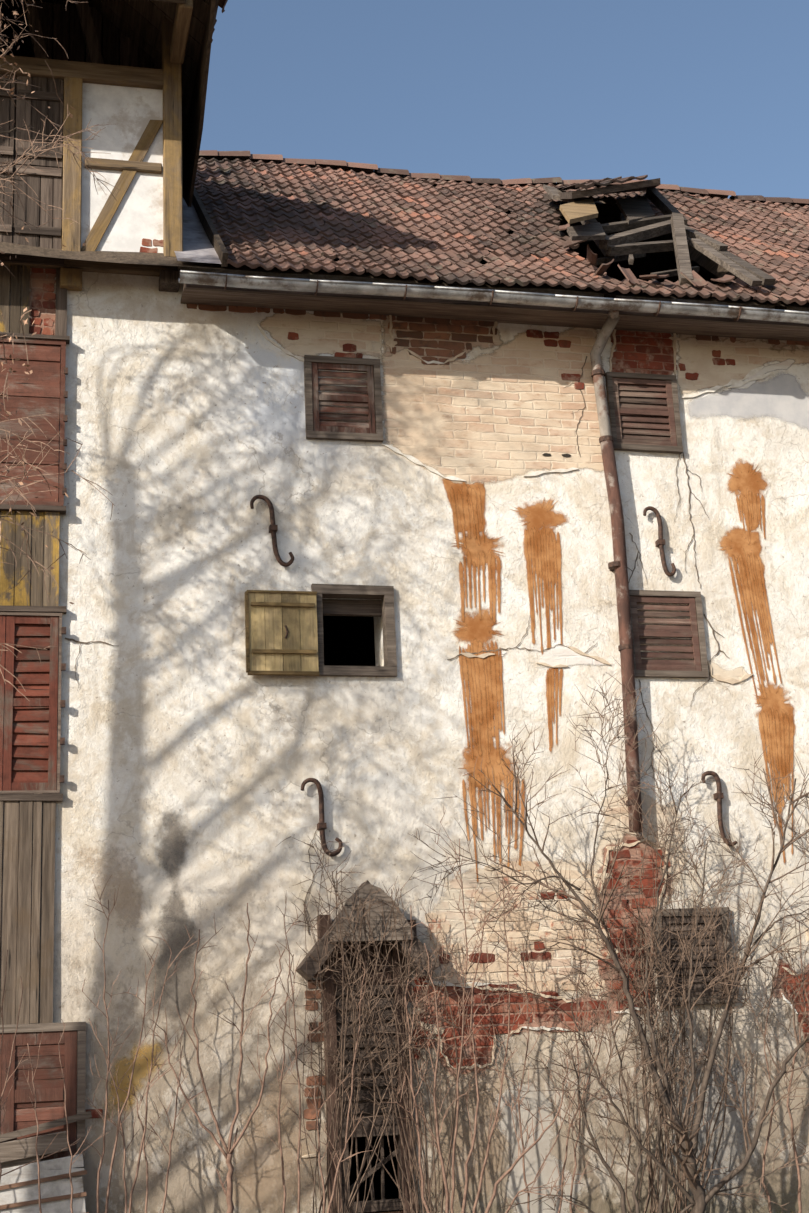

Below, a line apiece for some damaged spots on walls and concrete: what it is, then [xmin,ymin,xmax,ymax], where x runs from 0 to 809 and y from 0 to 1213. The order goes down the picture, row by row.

peeling [186,304,809,484]
rust [511,499,567,655]
crack [674,432,729,706]
rust [442,479,525,882]
rust [546,667,563,752]
rust [720,460,795,863]
damp [158,814,188,878]
damp [108,1044,161,1115]
damp [147,893,200,1017]
peeling [406,786,688,1076]
flaking render [772,960,809,1053]